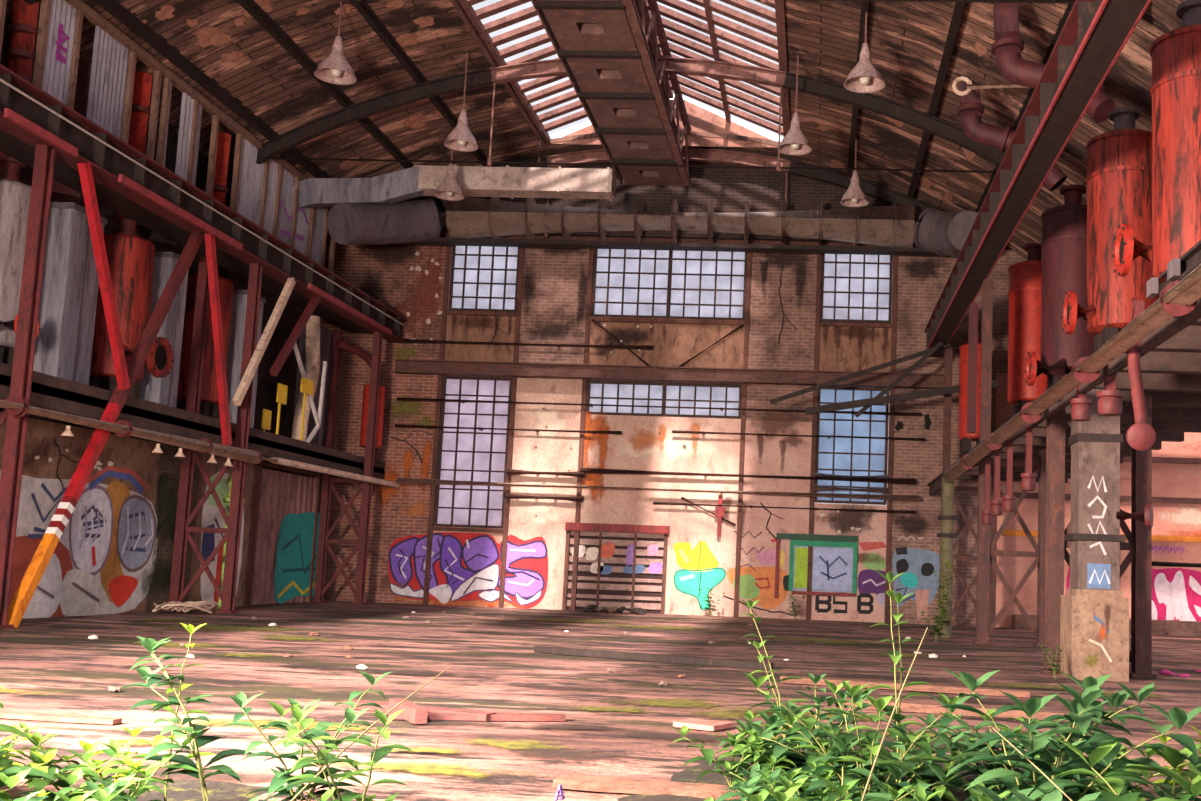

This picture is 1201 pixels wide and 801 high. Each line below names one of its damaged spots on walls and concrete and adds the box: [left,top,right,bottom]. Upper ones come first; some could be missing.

rust [582,410,609,500]